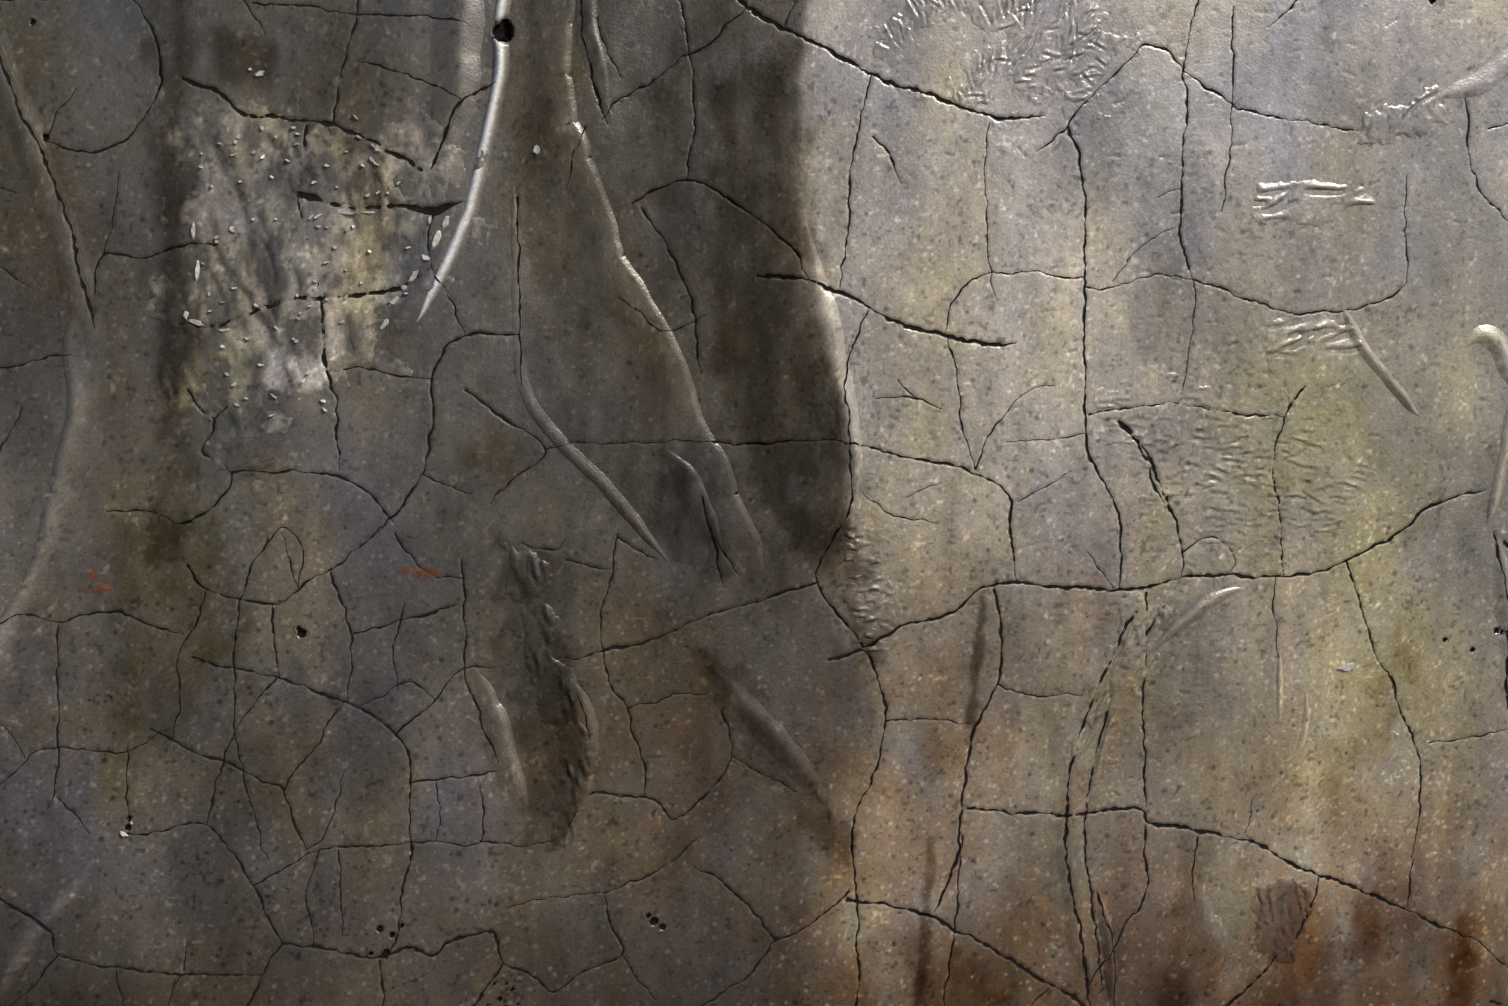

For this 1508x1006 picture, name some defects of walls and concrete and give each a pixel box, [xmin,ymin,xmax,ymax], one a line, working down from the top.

crack [0,0,700,1006]
crack [465,0,1508,1006]